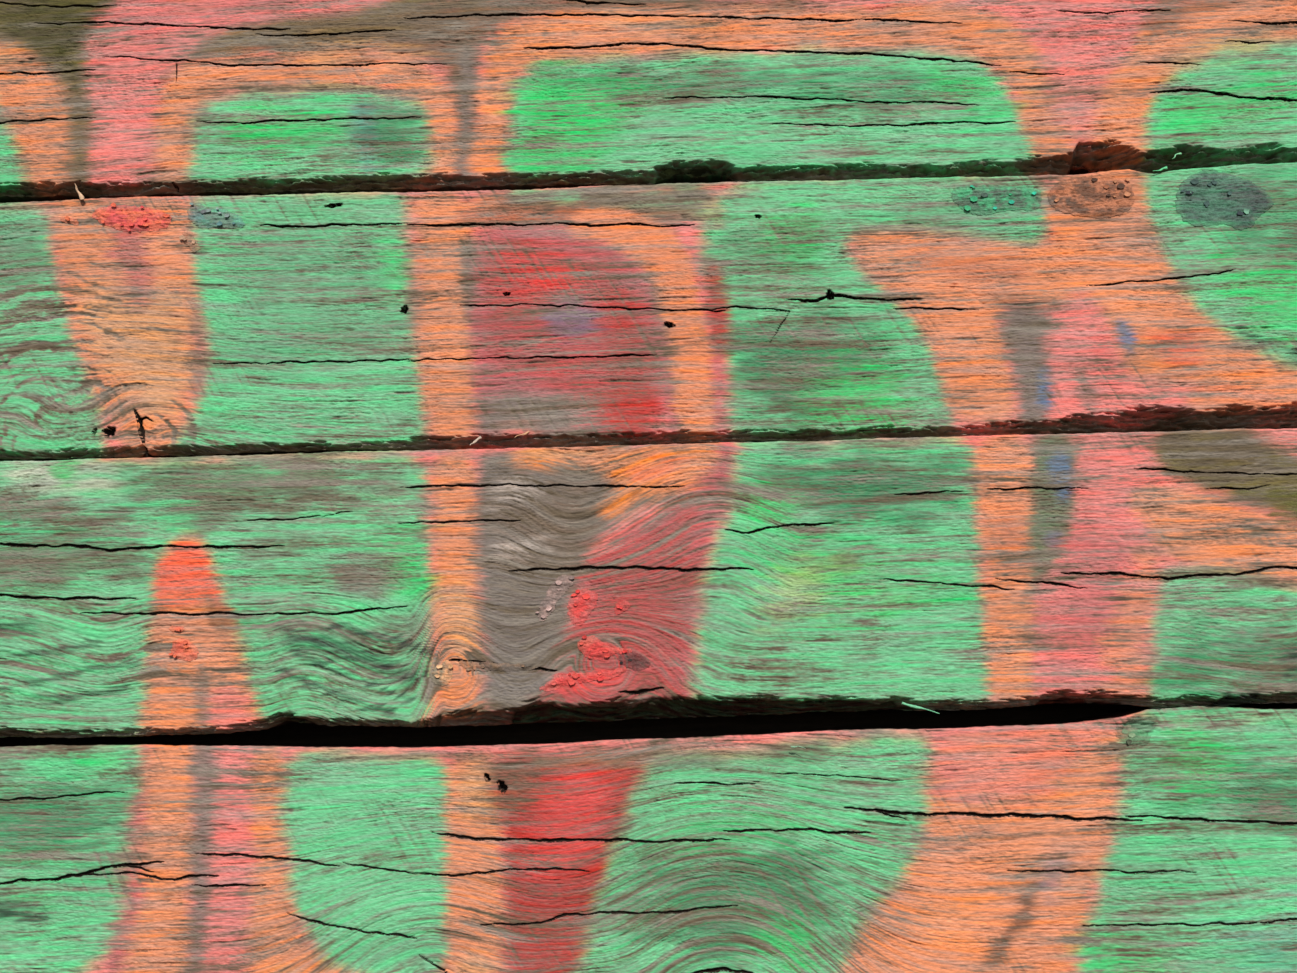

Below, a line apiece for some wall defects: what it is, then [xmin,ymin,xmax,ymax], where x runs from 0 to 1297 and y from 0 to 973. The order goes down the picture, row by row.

crack [1057,7,1170,15]
crack [0,0,1065,78]
crack [1225,20,1297,44]
crack [0,116,96,124]
crack [0,772,1297,888]
crack [482,905,738,926]
crack [1086,918,1297,927]
crack [286,912,447,973]
crack [693,965,753,973]